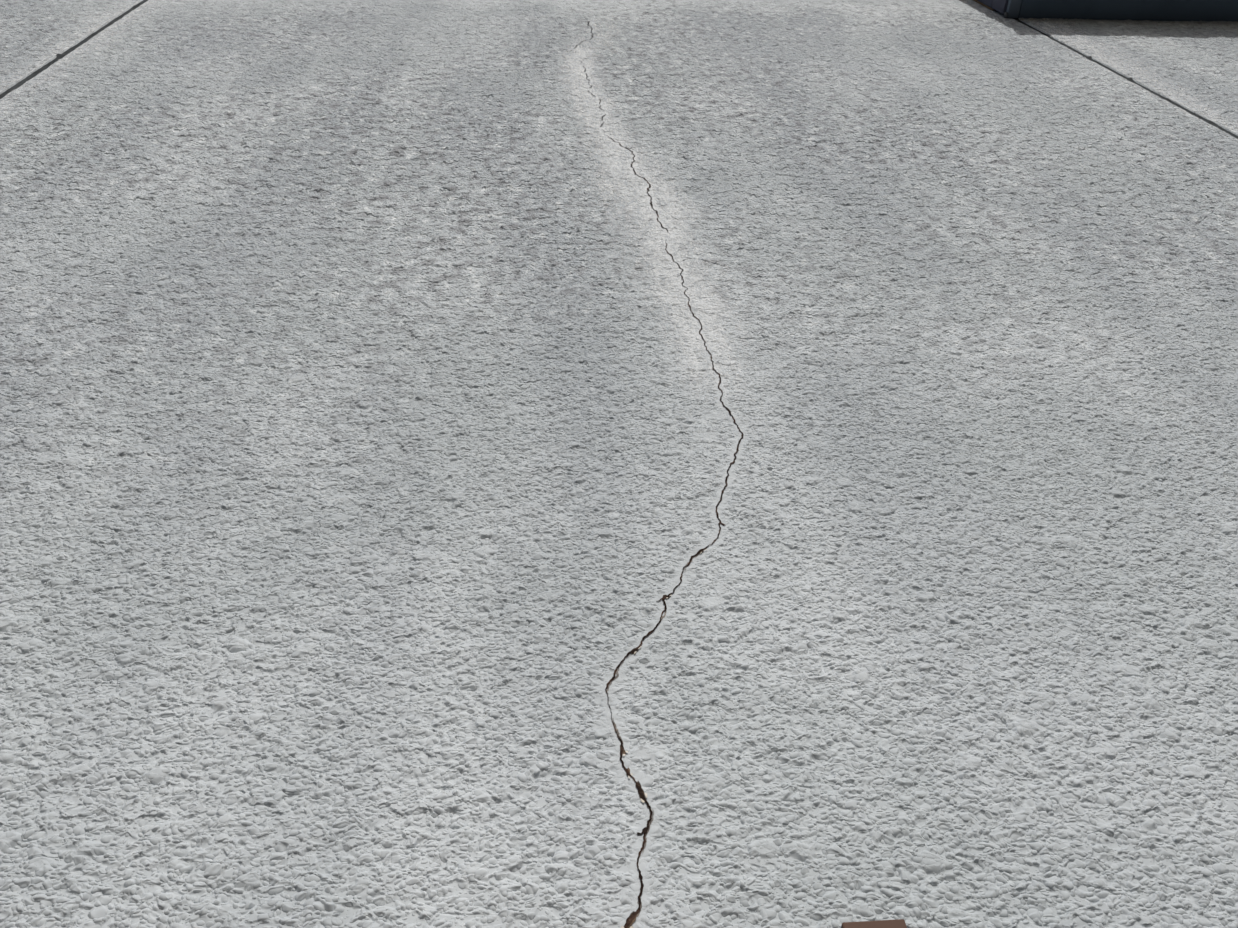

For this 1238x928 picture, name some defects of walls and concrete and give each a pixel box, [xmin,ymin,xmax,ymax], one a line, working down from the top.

crack [565,19,744,928]